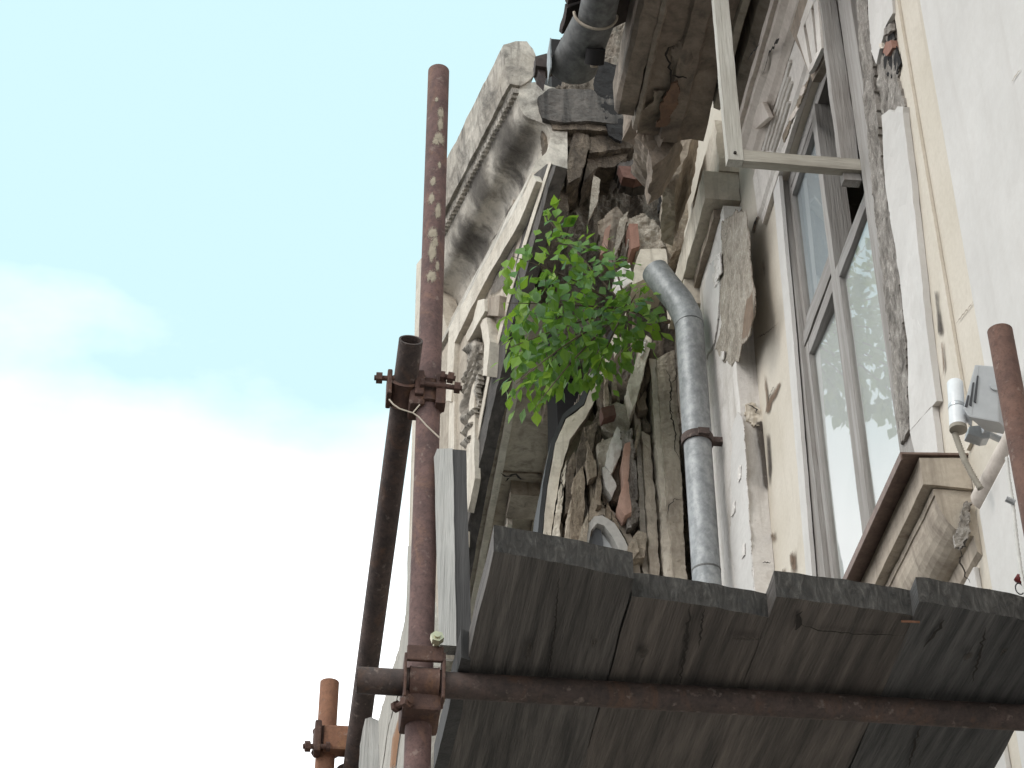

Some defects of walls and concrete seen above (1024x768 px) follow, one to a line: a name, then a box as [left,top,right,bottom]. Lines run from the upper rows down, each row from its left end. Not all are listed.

crack [665,45,687,83]
flaking render [876,20,907,115]
water stain [490,107,533,192]
water stain [452,222,497,272]
flaking render [588,160,665,277]
flaking render [597,405,640,536]
flaking render [953,501,972,551]